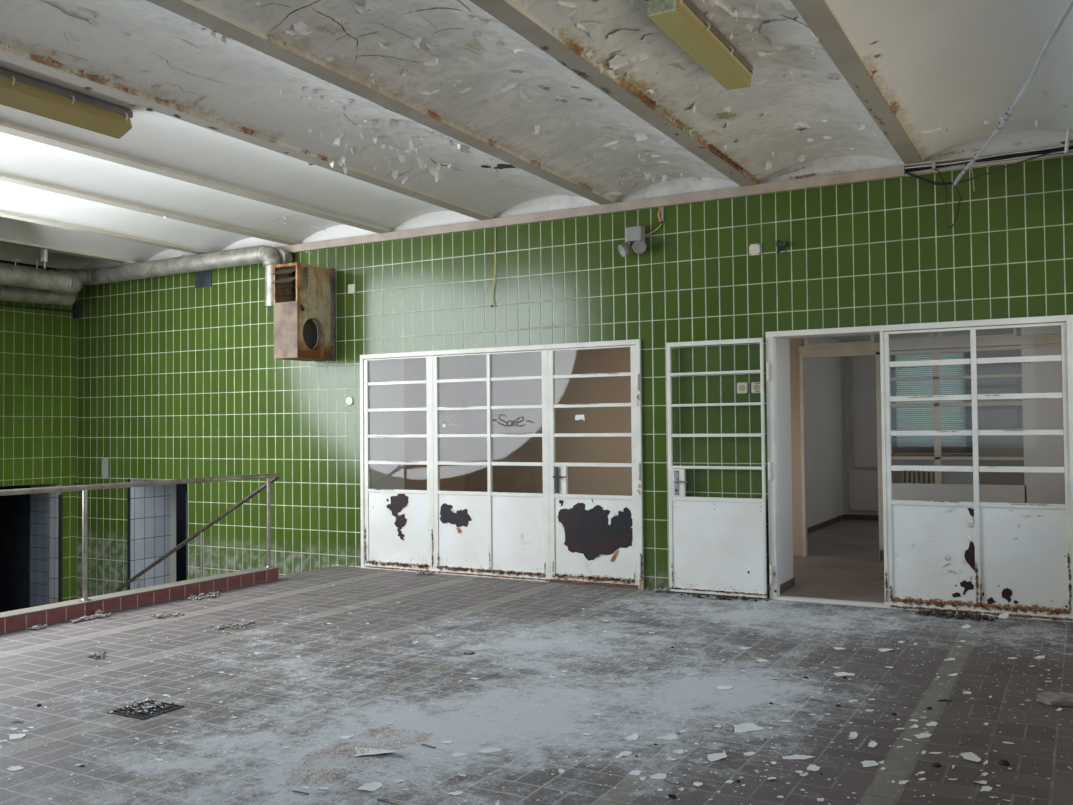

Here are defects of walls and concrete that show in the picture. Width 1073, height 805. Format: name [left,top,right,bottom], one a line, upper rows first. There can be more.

rust [30,54,64,69]
rust [77,69,136,95]
crack [254,0,477,63]
rust [564,38,660,109]
peeling [553,1,685,78]
peeling [697,0,841,86]
peeling [280,86,471,184]
spalling [478,158,517,173]
peeling [581,123,699,198]
rust [695,133,759,184]
rust [885,507,1073,621]